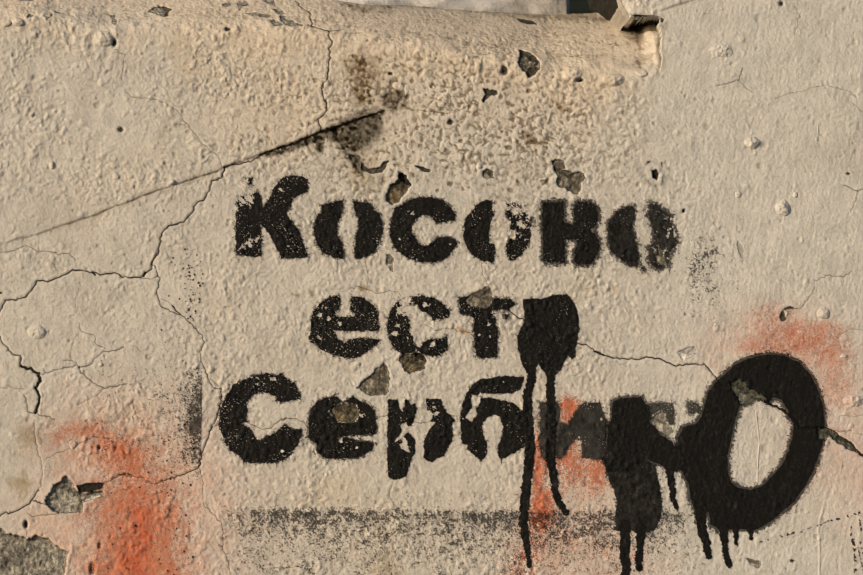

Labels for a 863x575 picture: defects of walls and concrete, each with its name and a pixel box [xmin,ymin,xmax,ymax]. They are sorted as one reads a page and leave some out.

spalling [518,50,540,78]
spalling [386,173,411,205]
spalling [540,159,585,194]
crack [0,1,385,485]
crack [561,342,717,378]
spalling [357,363,390,396]
crack [832,430,863,457]
crack [0,490,42,517]
spalling [45,476,104,513]
spalling [0,522,69,575]